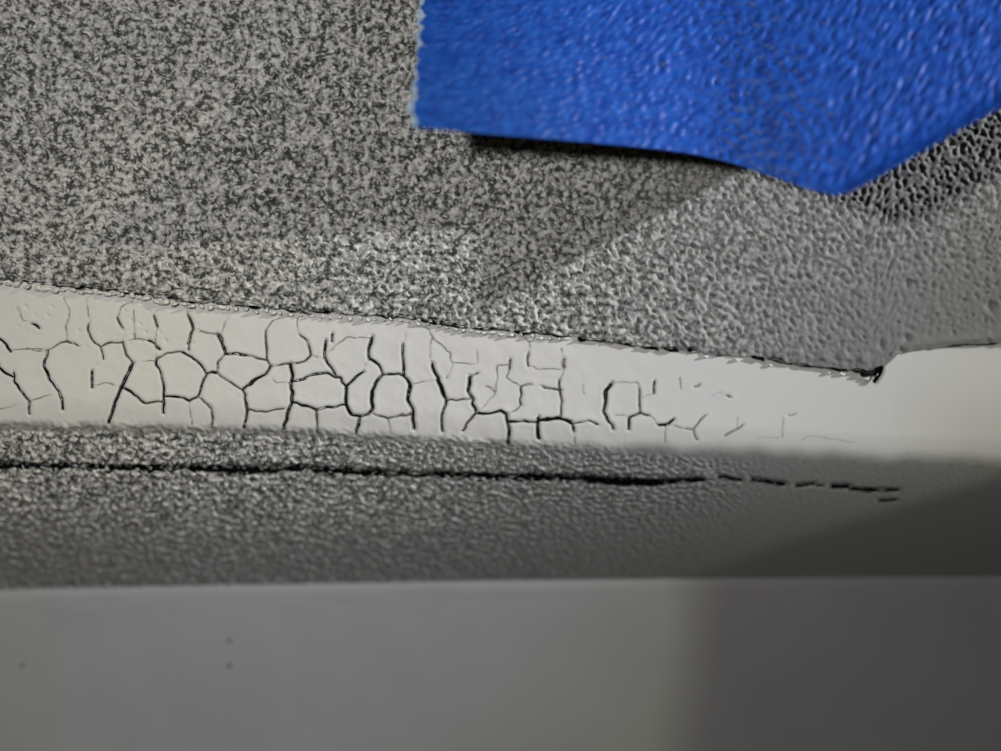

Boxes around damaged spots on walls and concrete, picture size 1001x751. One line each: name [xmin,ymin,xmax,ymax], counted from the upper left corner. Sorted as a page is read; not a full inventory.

crack [0,297,730,445]
crack [0,461,899,502]